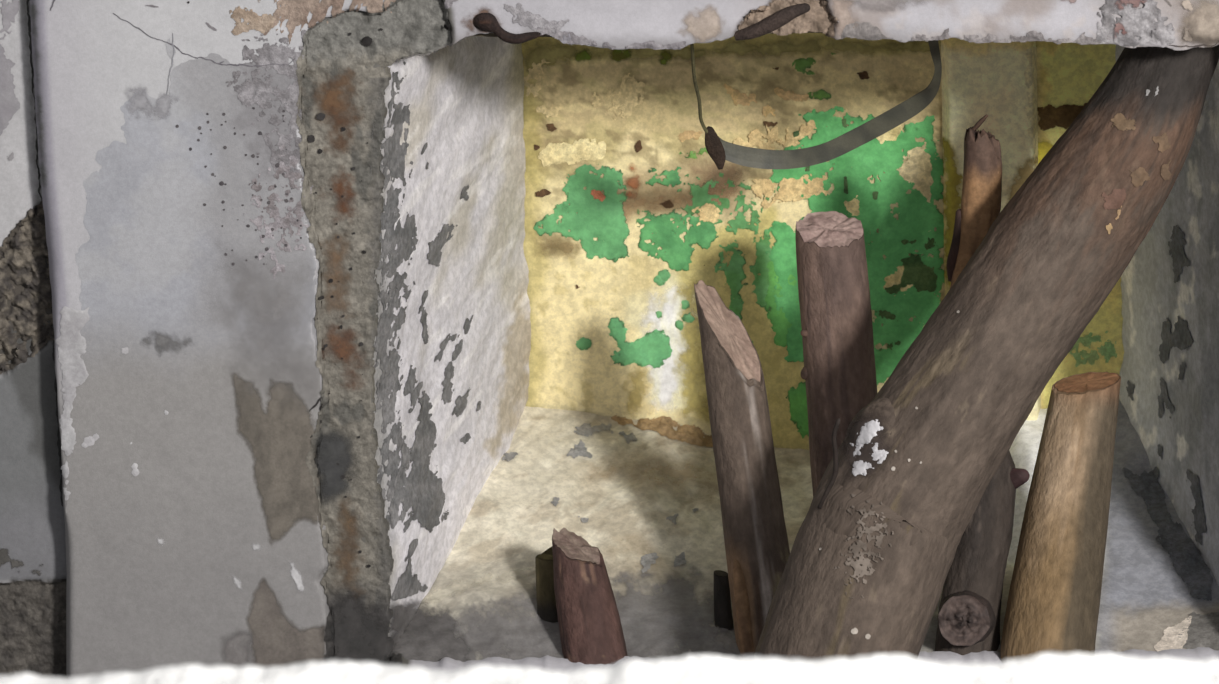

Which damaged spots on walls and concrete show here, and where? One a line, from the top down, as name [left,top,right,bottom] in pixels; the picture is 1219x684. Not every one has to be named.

crack [26,0,55,201]
crack [113,5,295,95]
peeling [504,3,686,50]
spalling [738,0,887,55]
peeling [524,57,945,385]
peeling [1168,225,1190,283]
crack [51,308,63,506]
peeling [0,0,481,678]
corrosion [328,328,359,362]
peeling [786,381,809,439]
peeling [1158,316,1193,419]
peeling [1122,444,1219,652]